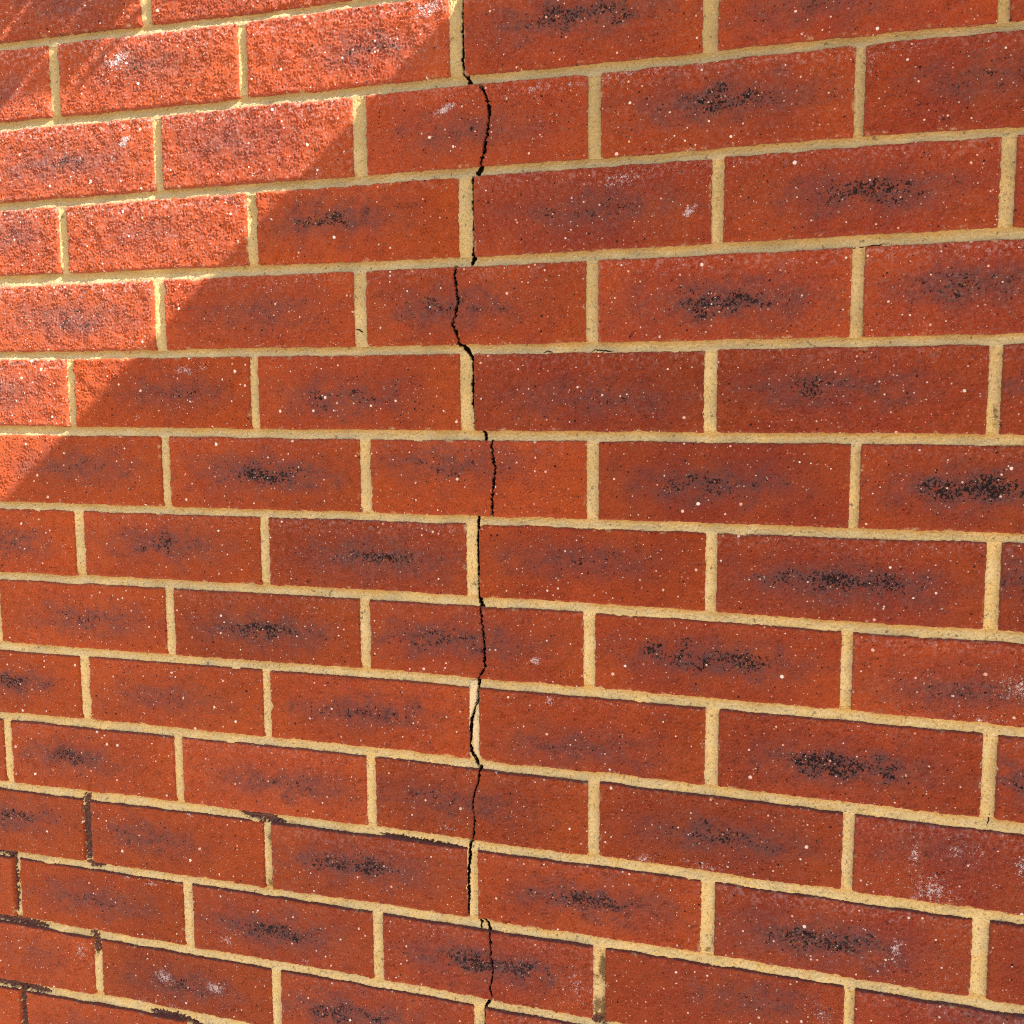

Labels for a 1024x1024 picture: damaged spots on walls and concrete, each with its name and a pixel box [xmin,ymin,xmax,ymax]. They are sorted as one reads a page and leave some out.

crack [451,2,497,1024]